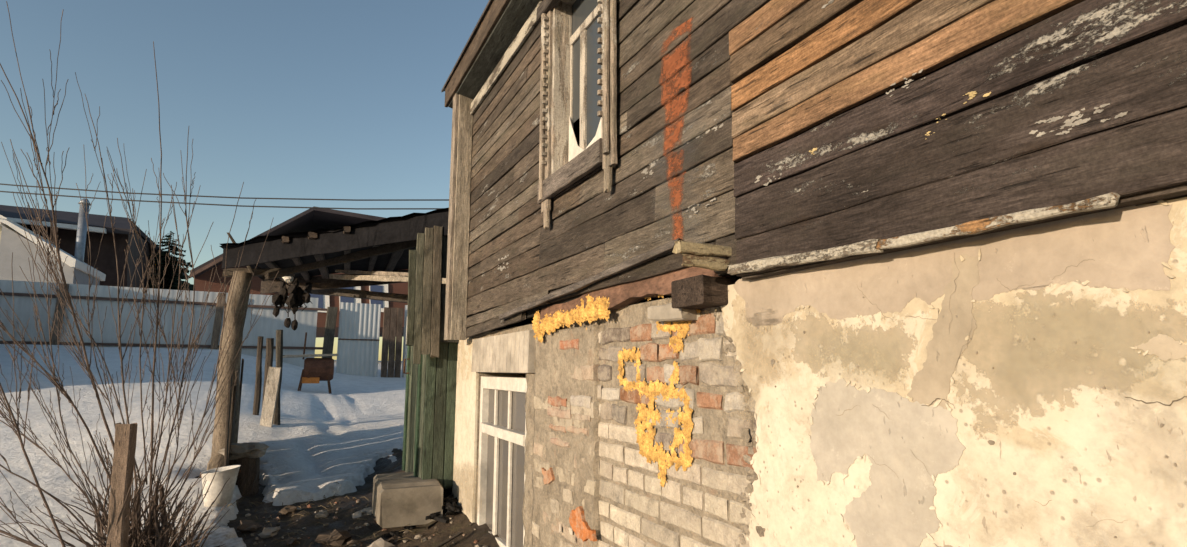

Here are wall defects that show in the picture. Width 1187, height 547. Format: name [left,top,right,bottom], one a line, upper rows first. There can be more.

corrosion [660,18,692,240]
peeling [1029,102,1128,137]
spalling [559,506,597,542]
spalling [704,307,765,547]
peeling [734,200,1187,547]
crack [1125,396,1187,406]